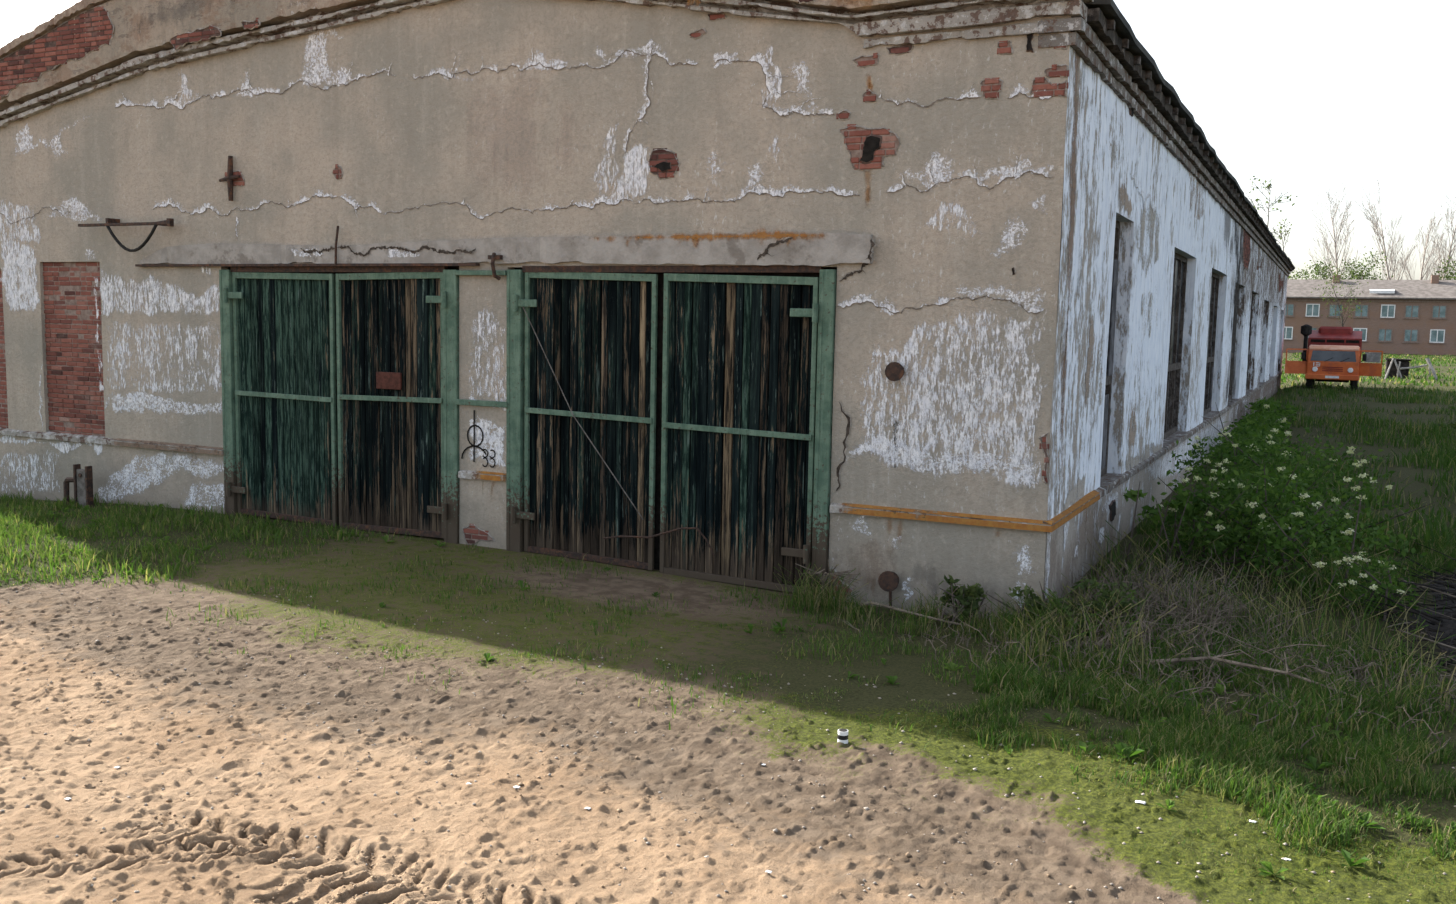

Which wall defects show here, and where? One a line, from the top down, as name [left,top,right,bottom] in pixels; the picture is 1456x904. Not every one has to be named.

spalling [0,5,114,100]
crack [115,44,834,154]
crack [153,150,1052,260]
peeling [591,125,680,201]
corrosion [635,229,823,241]
spalling [759,43,1054,237]
crack [837,238,1044,314]
crack [879,83,1052,108]
peeling [1109,140,1161,337]
flaking render [0,197,222,494]
peeling [846,195,1086,608]
peeling [98,451,225,509]